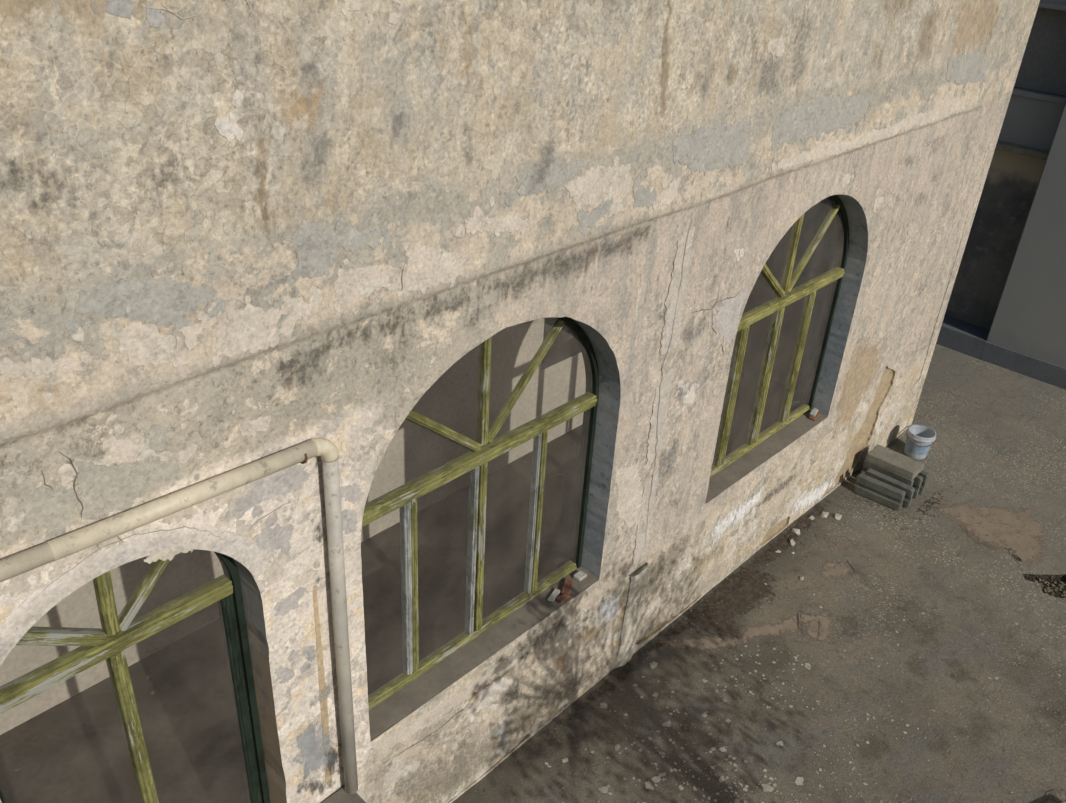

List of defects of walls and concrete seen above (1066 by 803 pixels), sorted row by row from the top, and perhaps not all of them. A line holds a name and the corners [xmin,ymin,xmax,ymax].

peeling [771,42,989,171]
peeling [455,156,681,238]
peeling [109,240,472,367]
damp [478,226,649,298]
peeling [660,227,695,355]
crack [41,452,84,518]
peeling [143,547,194,564]
peeling [615,367,701,564]
damp [691,478,791,573]
flaking render [760,516,800,554]
flaking render [808,366,895,520]